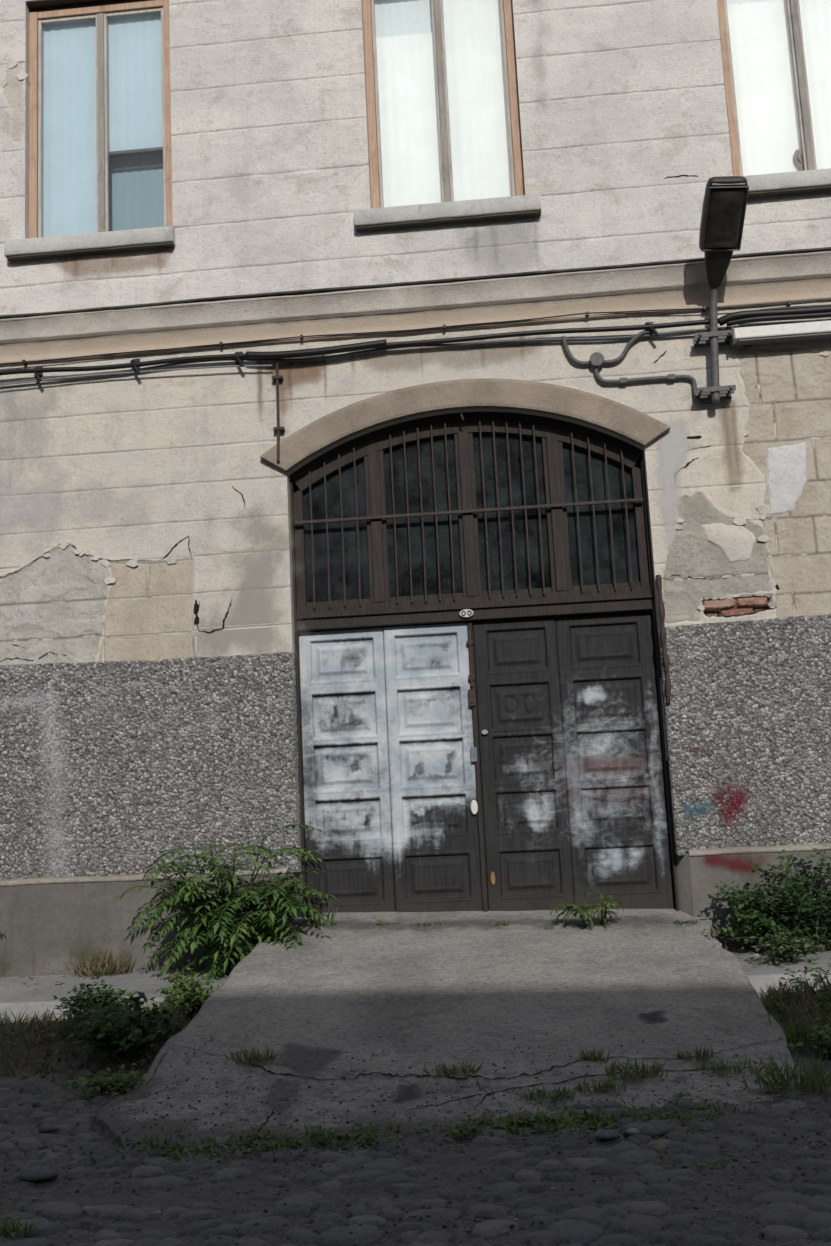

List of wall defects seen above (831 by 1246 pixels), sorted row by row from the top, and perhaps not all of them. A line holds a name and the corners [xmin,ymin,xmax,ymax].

crack [0,535,192,577]
peeling [657,494,780,624]
crack [0,644,67,662]
peeling [0,542,116,665]
crack [195,599,232,634]
crack [164,1031,783,1111]